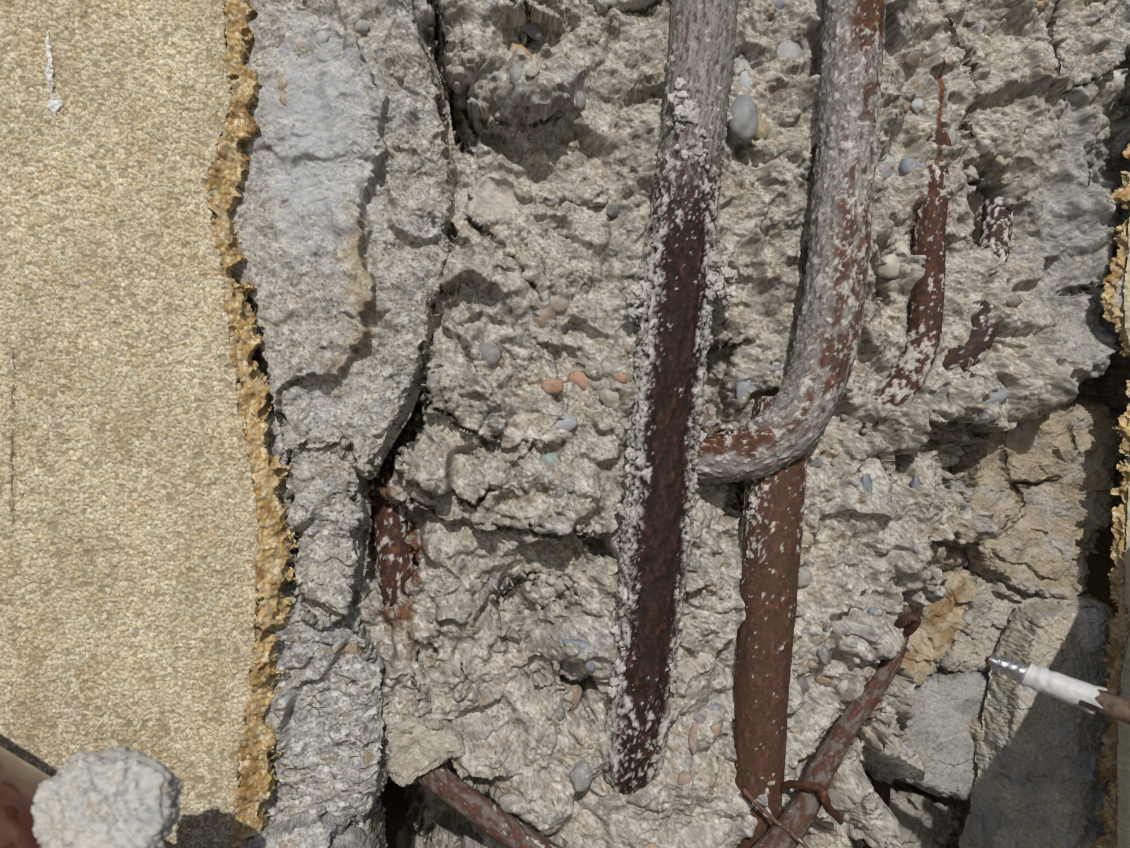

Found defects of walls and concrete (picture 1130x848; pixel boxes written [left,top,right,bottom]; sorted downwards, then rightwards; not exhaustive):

crack [428,0,474,155]
rust [934,57,946,165]
crack [1050,34,1096,95]
spalling [205,0,299,848]
rust [369,483,391,565]
rust [408,508,427,584]
spalling [353,0,1130,848]
crack [1001,431,1061,528]
crack [1070,425,1082,458]
rust [381,600,413,657]